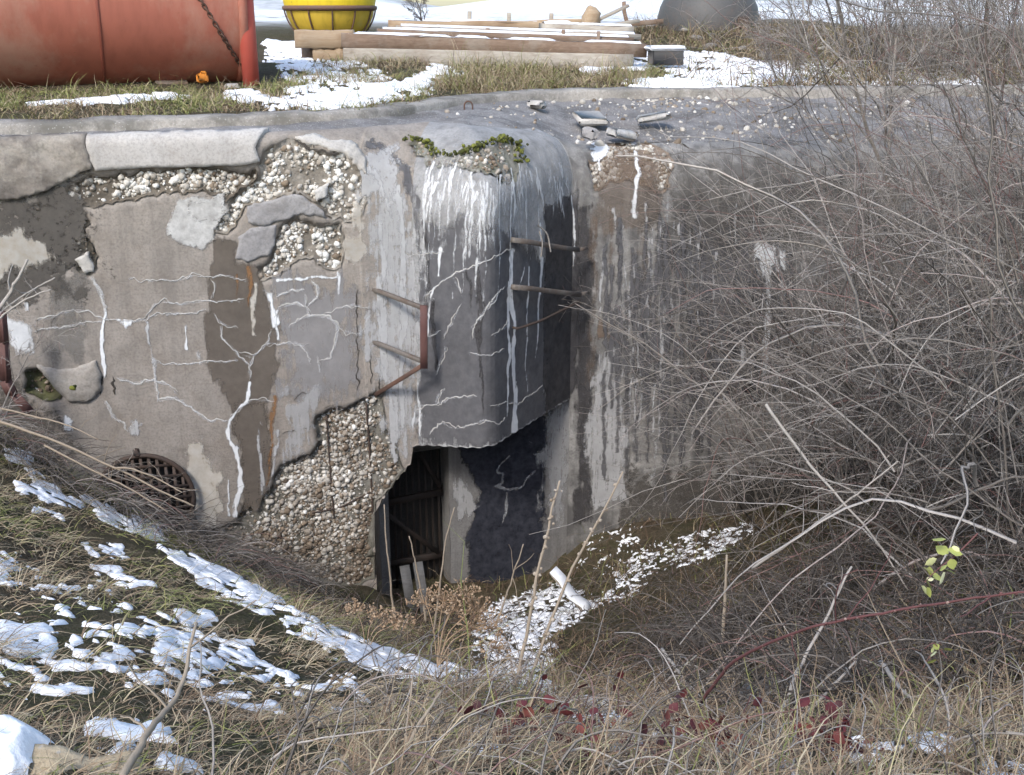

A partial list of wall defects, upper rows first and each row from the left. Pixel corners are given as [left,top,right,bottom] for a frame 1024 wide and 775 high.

spalling [0,133,370,283]
spalling [408,140,520,184]
spalling [588,143,674,194]
spalling [25,369,62,401]
crack [36,272,381,432]
crack [405,248,543,434]
water stain [186,138,802,528]
spalling [206,394,404,586]